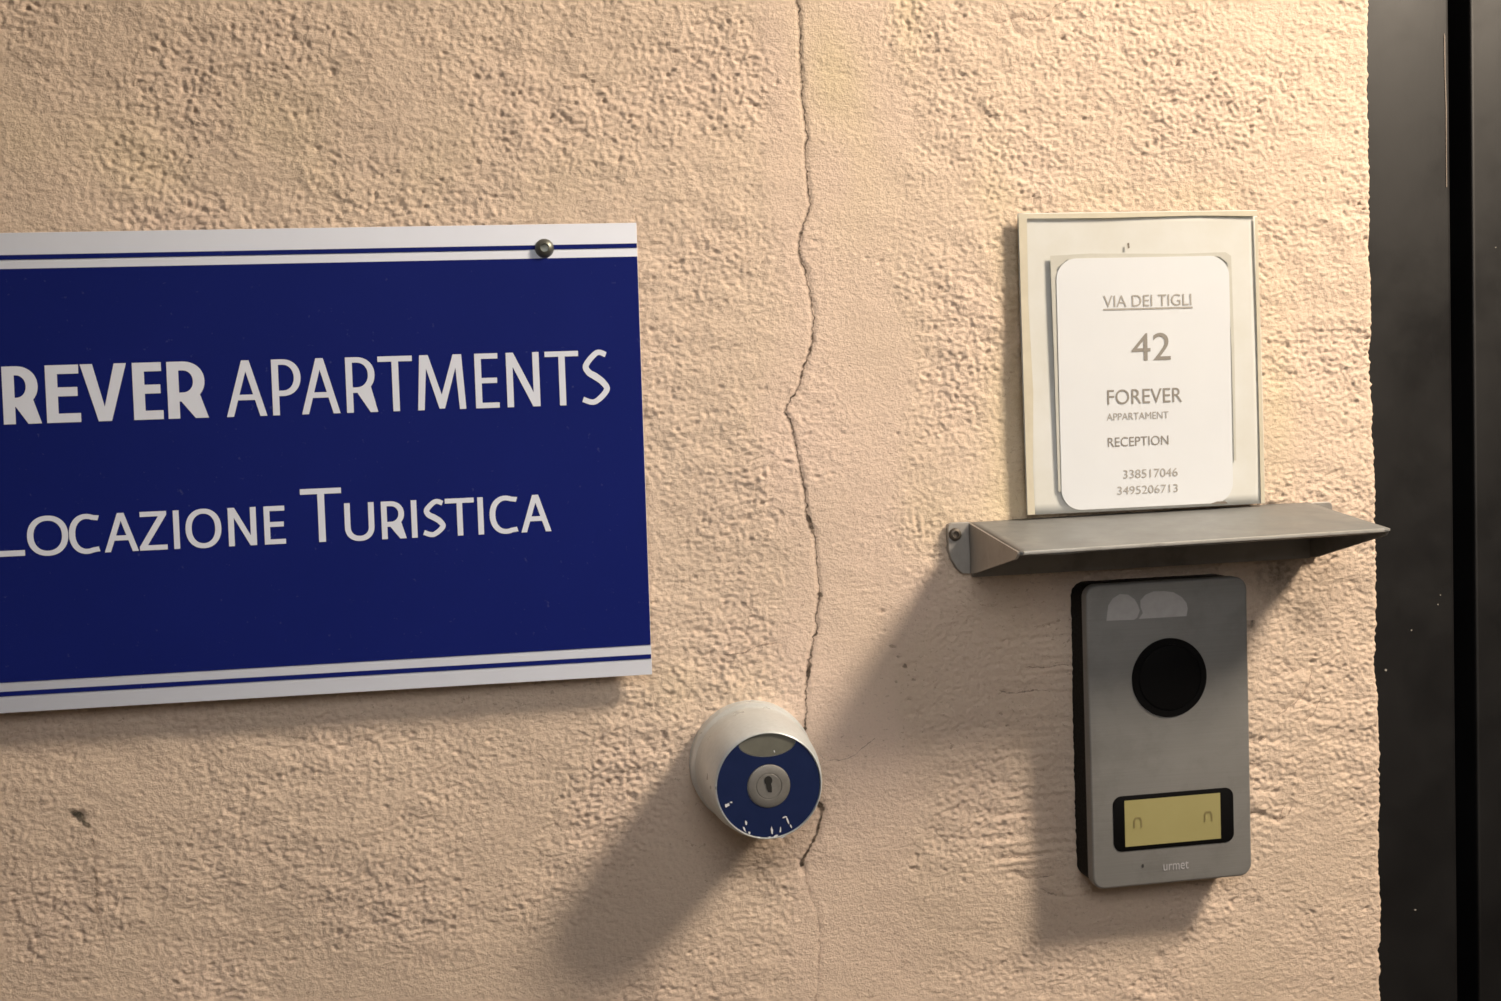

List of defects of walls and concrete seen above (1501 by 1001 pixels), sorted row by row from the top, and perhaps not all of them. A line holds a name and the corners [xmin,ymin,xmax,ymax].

crack [783,0,870,761]
crack [800,802,825,962]